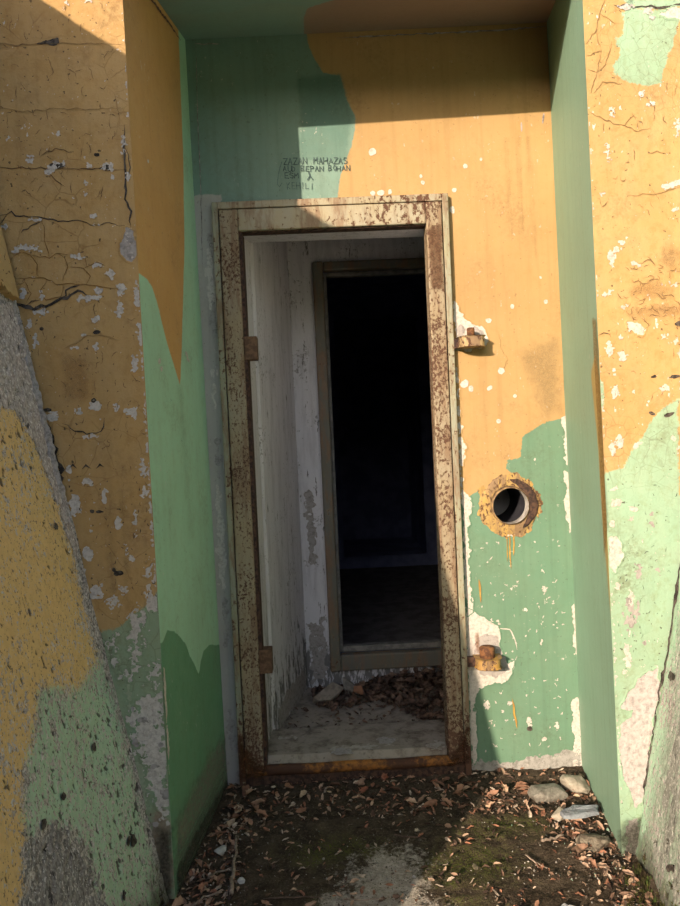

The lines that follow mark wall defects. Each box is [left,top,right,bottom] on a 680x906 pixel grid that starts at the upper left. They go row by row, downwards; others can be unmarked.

crack [588,0,680,90]
spalling [0,286,109,572]
crack [0,4,145,487]
peeling [90,393,171,829]
corrosion [238,737,267,780]
corrosion [430,226,443,288]
corrosion [448,728,470,766]
peeling [455,365,582,771]
corrosion [510,479,538,528]
crack [598,259,680,352]
peeling [608,520,674,853]
crack [618,485,680,804]